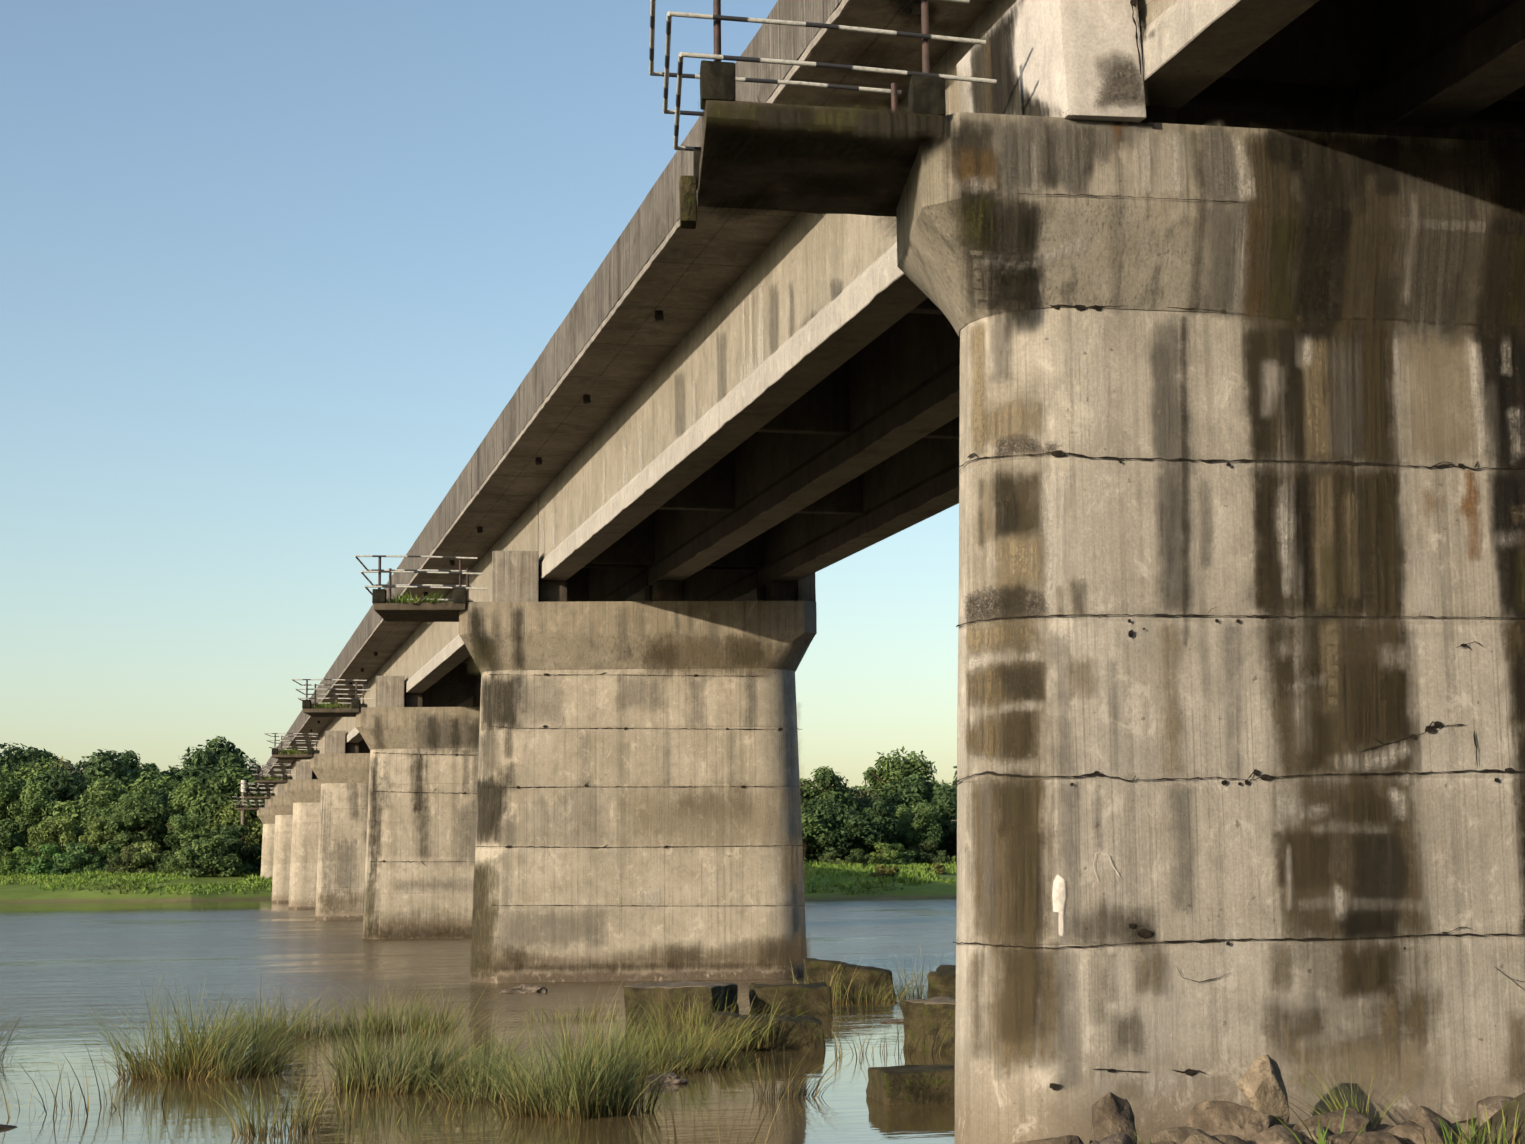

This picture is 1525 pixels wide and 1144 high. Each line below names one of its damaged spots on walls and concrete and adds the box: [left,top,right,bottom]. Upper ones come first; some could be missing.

leakage [970,0,1143,191]
crack [1130,0,1151,74]
leakage [971,207,1081,449]
leakage [410,609,523,854]
leakage [966,620,1044,759]
leakage [980,474,1061,597]
leakage [1153,320,1207,610]
crack [955,721,1525,786]
crack [957,450,1525,471]
leakage [1199,124,1525,1087]
leakage [376,869,484,935]
leakage [972,778,1058,1068]